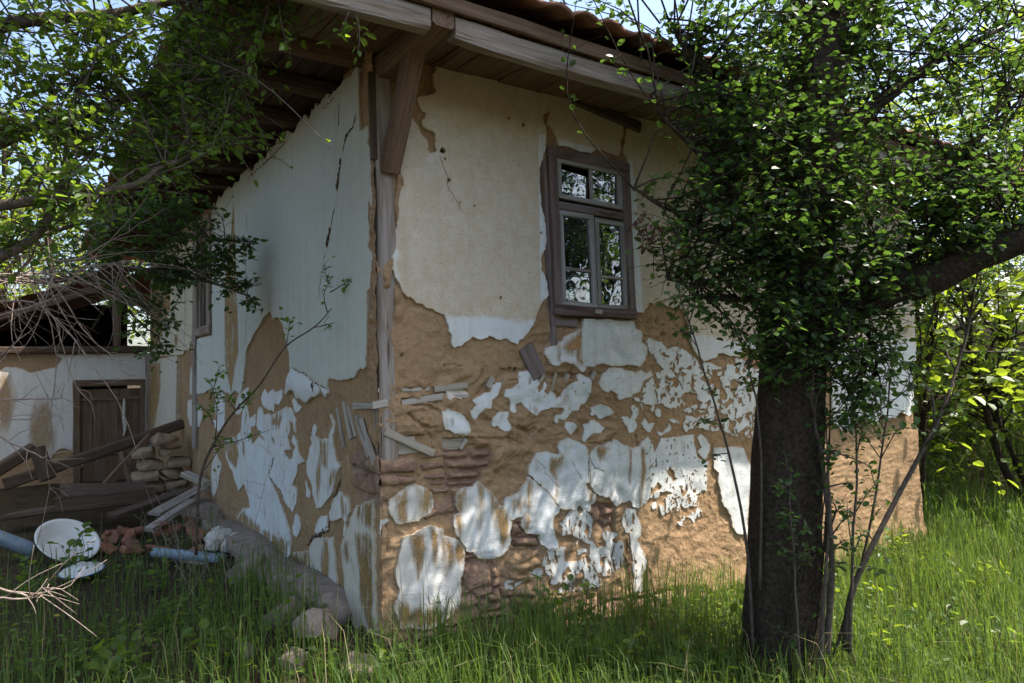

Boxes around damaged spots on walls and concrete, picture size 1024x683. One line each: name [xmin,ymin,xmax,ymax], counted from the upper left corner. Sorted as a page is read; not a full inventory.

crack [318,97,356,296]
spalling [412,69,435,153]
spalling [153,160,760,651]
spalling [822,369,927,562]